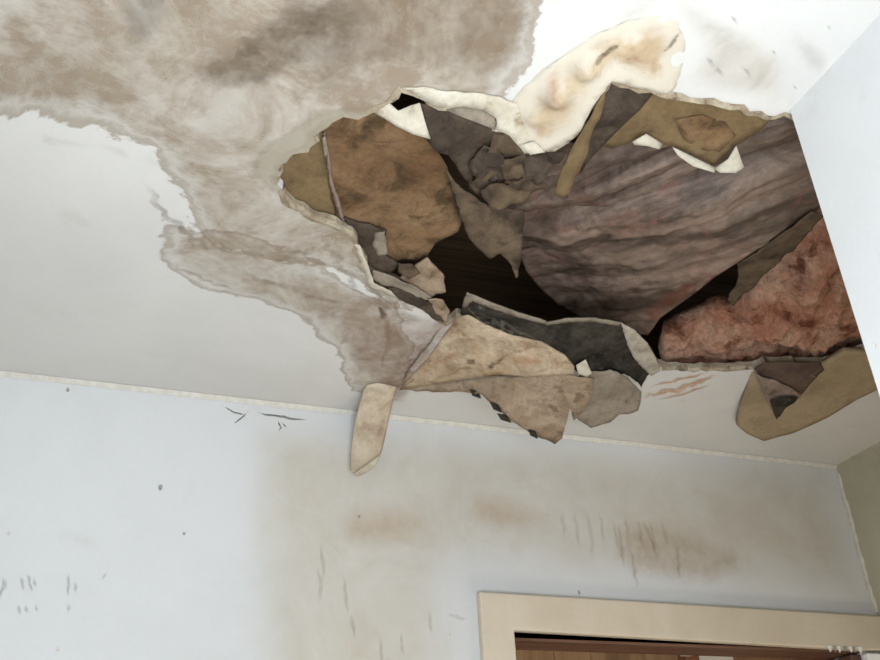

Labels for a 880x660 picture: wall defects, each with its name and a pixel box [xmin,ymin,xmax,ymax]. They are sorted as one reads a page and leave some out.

leakage [0,0,521,213]
flaking render [258,114,360,189]
peeling [400,87,545,155]
leakage [295,279,404,361]
peeling [350,383,396,476]
peeling [471,389,511,423]
peeling [576,359,592,378]